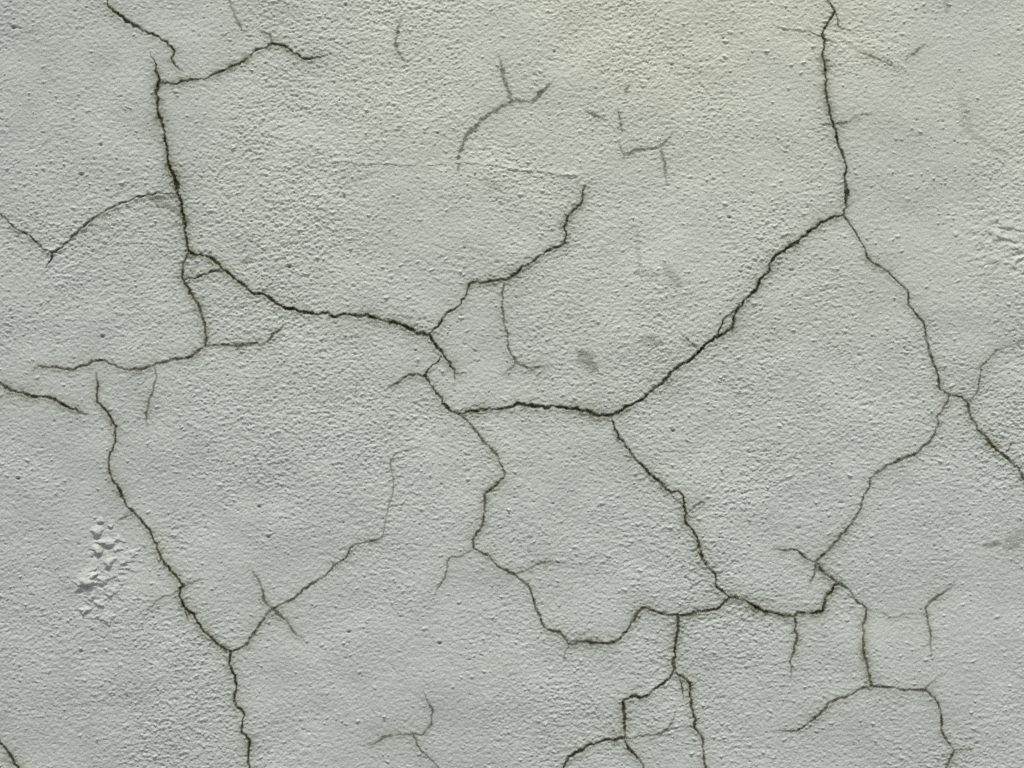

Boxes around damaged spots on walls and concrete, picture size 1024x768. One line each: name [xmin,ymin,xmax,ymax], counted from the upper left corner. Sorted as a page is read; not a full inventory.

crack [0,214,98,264]
crack [41,0,929,455]
crack [929,354,1024,480]
crack [0,383,378,768]
crack [472,462,505,556]
crack [528,421,738,768]
crack [745,600,783,616]
crack [779,410,943,661]
crack [788,640,961,767]